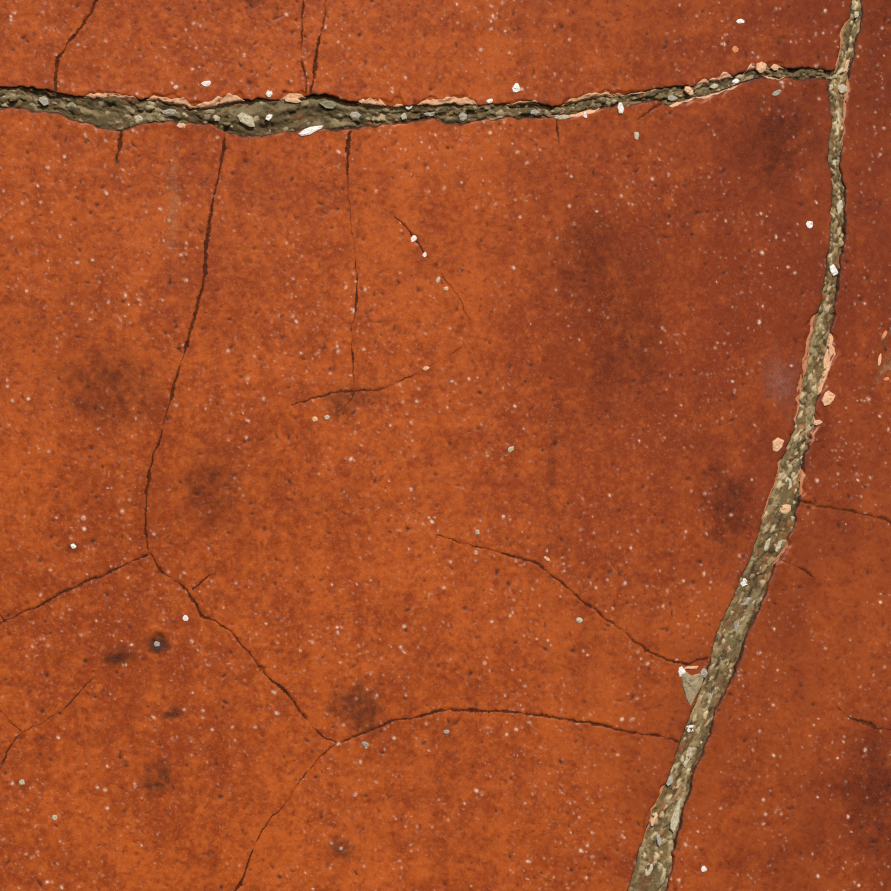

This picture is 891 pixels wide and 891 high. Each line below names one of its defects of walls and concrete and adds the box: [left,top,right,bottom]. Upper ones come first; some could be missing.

crack [54,20,86,91]
crack [305,36,320,94]
crack [344,131,352,176]
crack [0,62,837,160]
crack [182,138,227,359]
crack [394,215,427,257]
crack [291,261,429,422]
peeling [878,354,891,381]
crack [627,0,862,891]
crack [0,431,306,719]
crack [315,708,661,756]
crack [234,805,284,891]